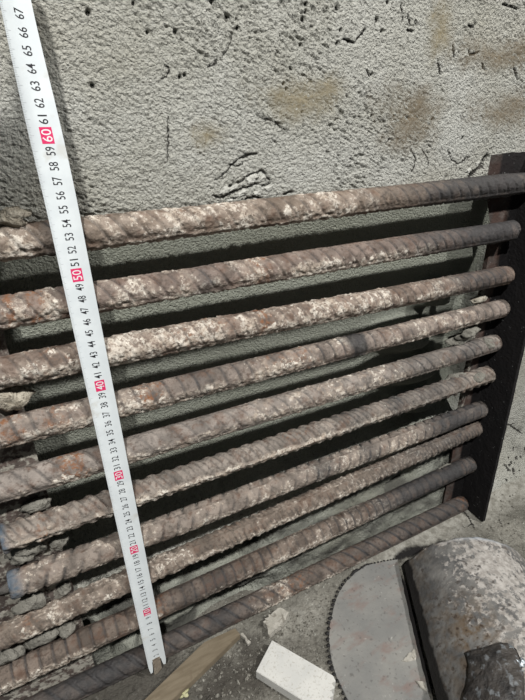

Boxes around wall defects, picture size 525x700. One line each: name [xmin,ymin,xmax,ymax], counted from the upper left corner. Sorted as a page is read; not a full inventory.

flaking render [215,170,273,202]
peeling [401,648,417,662]